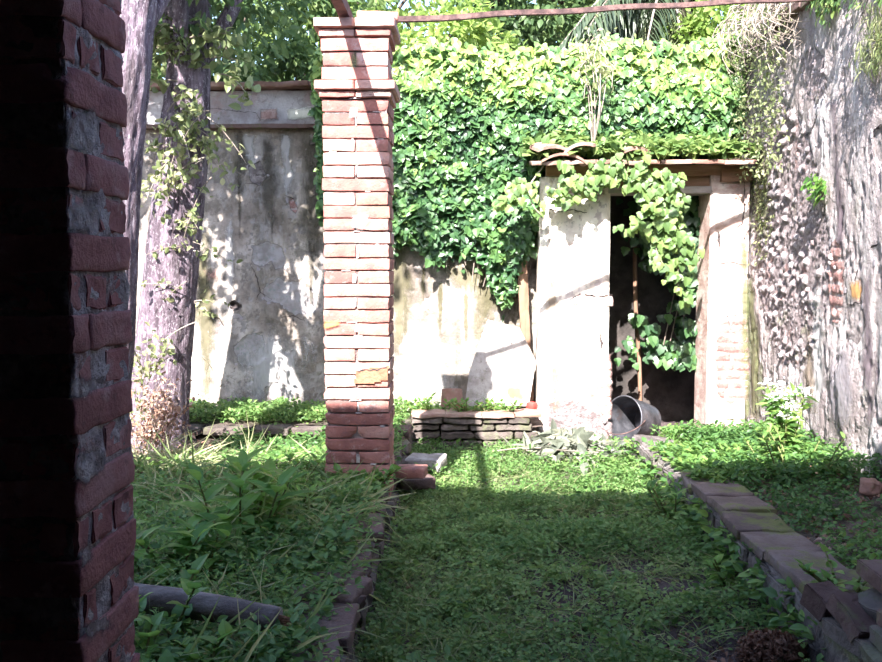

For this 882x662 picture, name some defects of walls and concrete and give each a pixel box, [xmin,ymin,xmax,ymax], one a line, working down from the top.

spalling [782,31,794,52]
spalling [801,44,826,108]
water stain [226,131,293,286]
water stain [302,142,320,303]
spalling [751,92,865,367]
water stain [195,233,216,394]
water stain [246,340,296,396]
spalling [545,340,612,440]
spalling [569,291,613,309]
spalling [713,312,749,403]